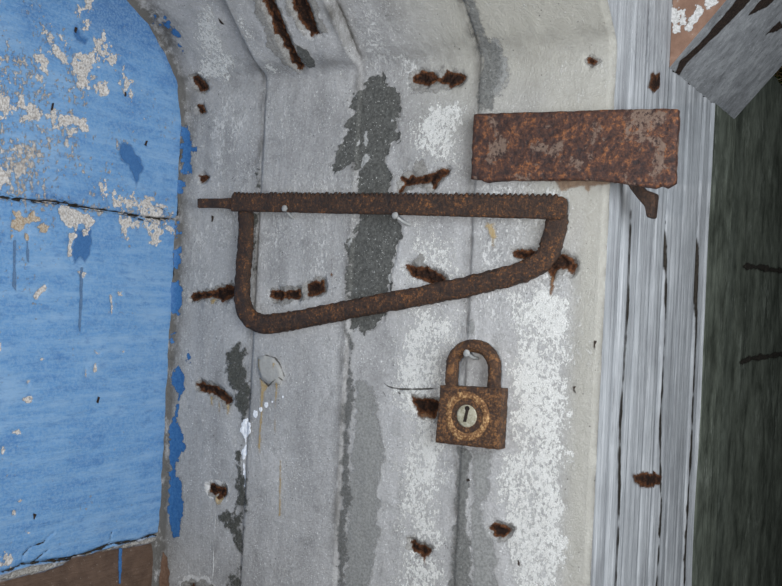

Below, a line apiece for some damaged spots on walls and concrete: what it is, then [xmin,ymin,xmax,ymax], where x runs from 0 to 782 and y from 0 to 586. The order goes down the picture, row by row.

peeling [33,0,134,102]
water stain [463,0,509,110]
peeling [671,0,718,34]
peeling [0,56,89,148]
peeling [0,148,20,186]
peeling [11,210,49,241]
peeling [58,205,95,257]
crack [0,195,178,221]
peeling [98,179,175,247]
water stain [218,342,273,553]
water stain [448,447,498,586]
spalling [0,551,67,580]